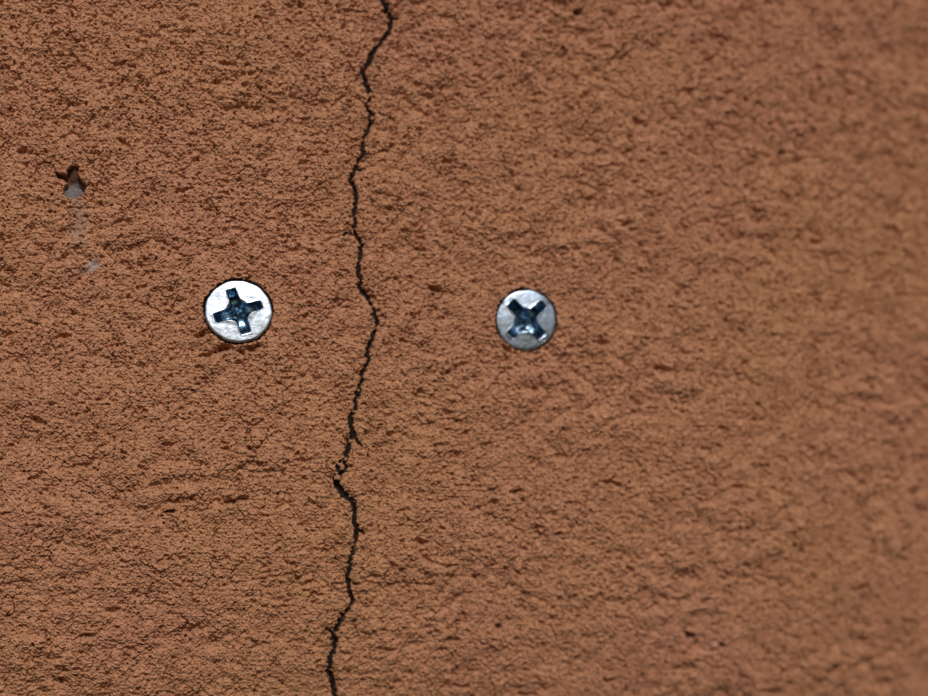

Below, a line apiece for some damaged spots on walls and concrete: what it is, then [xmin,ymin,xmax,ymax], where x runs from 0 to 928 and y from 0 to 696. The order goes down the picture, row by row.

spalling [56,167,85,198]
crack [325,0,395,696]